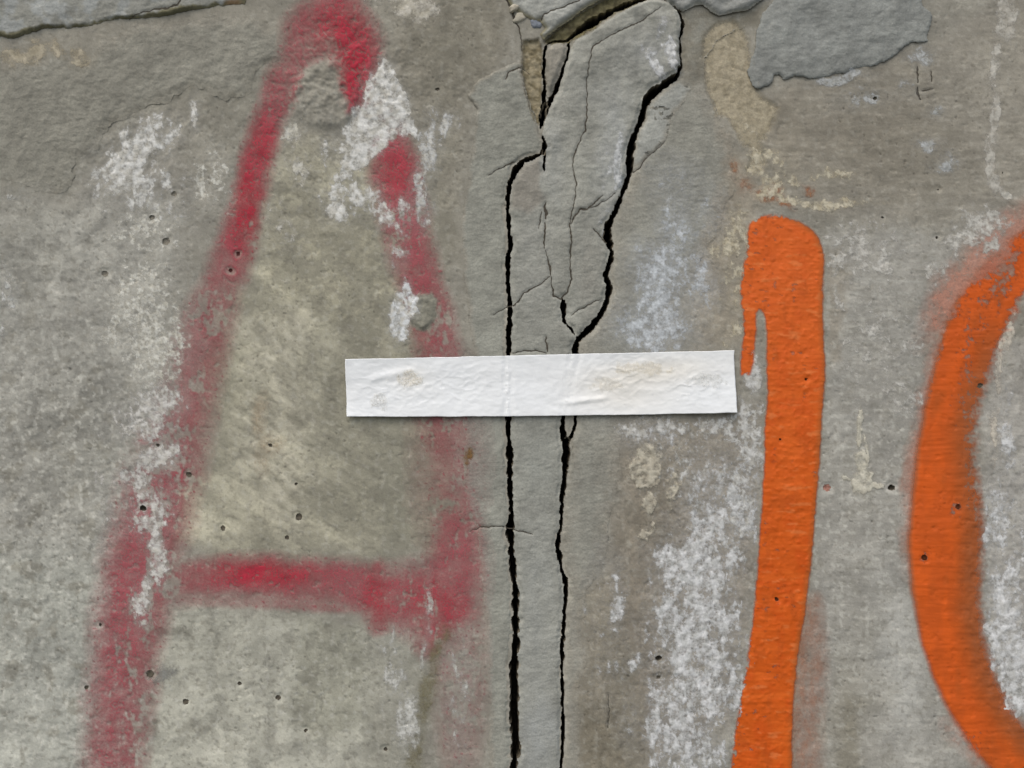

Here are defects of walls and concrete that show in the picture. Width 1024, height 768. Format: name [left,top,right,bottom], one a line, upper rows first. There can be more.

crack [488,0,685,356]
peeling [710,210,750,306]
spalling [703,21,865,212]
peeling [908,47,932,100]
crack [470,415,577,768]
efflorescence [601,575,624,637]
efflorescence [608,351,765,768]